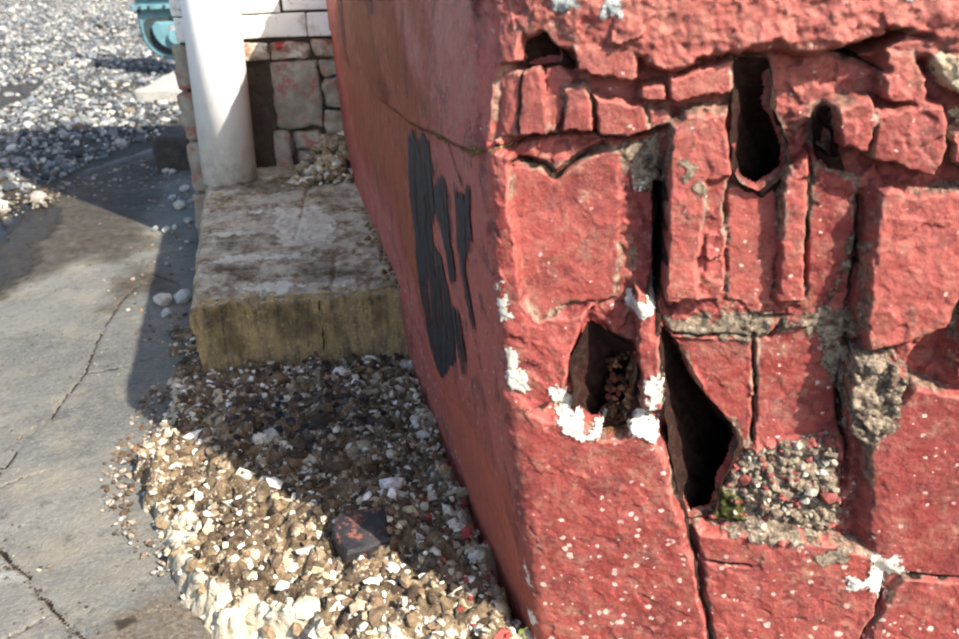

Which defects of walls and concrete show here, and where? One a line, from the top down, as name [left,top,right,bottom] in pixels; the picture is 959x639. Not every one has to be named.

spalling [550,0,580,12]
spalling [599,0,624,20]
spalling [524,32,576,70]
spalling [924,51,959,93]
spalling [729,56,791,198]
spalling [812,106,845,171]
spalling [621,130,708,196]
peeling [494,281,514,322]
spalling [548,231,909,598]
crack [672,464,744,639]
crack [905,571,959,580]